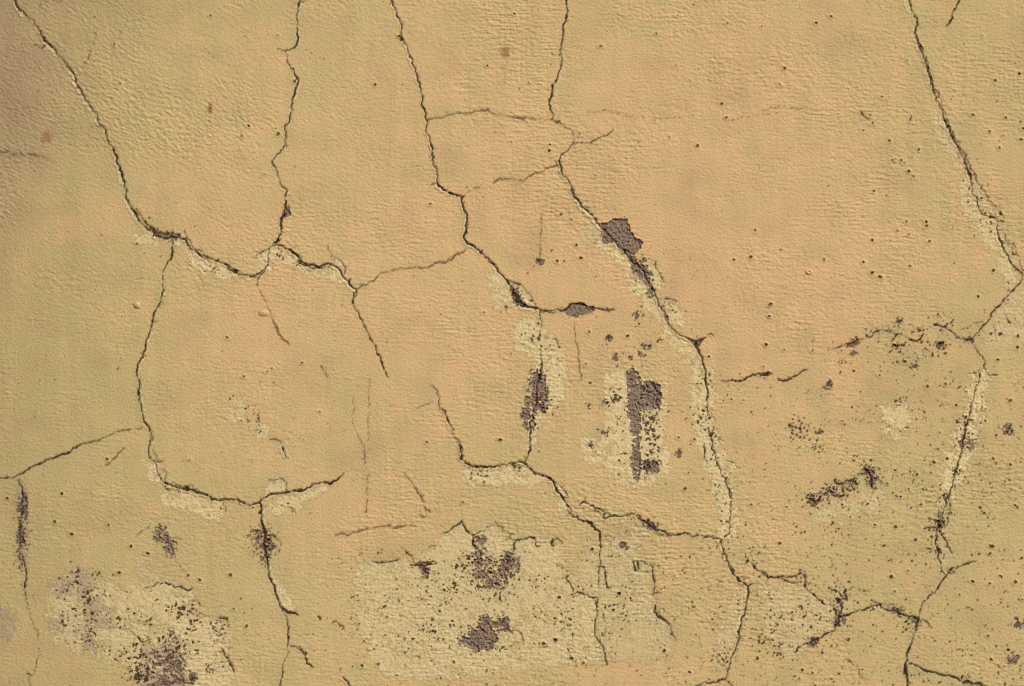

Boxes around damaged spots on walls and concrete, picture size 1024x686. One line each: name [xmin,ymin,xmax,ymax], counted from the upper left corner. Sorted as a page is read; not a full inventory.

peeling [45,524,247,686]
crack [5,0,614,668]
peeling [353,510,675,682]
peeling [460,269,570,518]
spalling [564,302,595,318]
peeling [575,218,753,540]
crack [427,0,1024,686]
peeling [801,448,901,527]
peeling [821,109,1024,583]